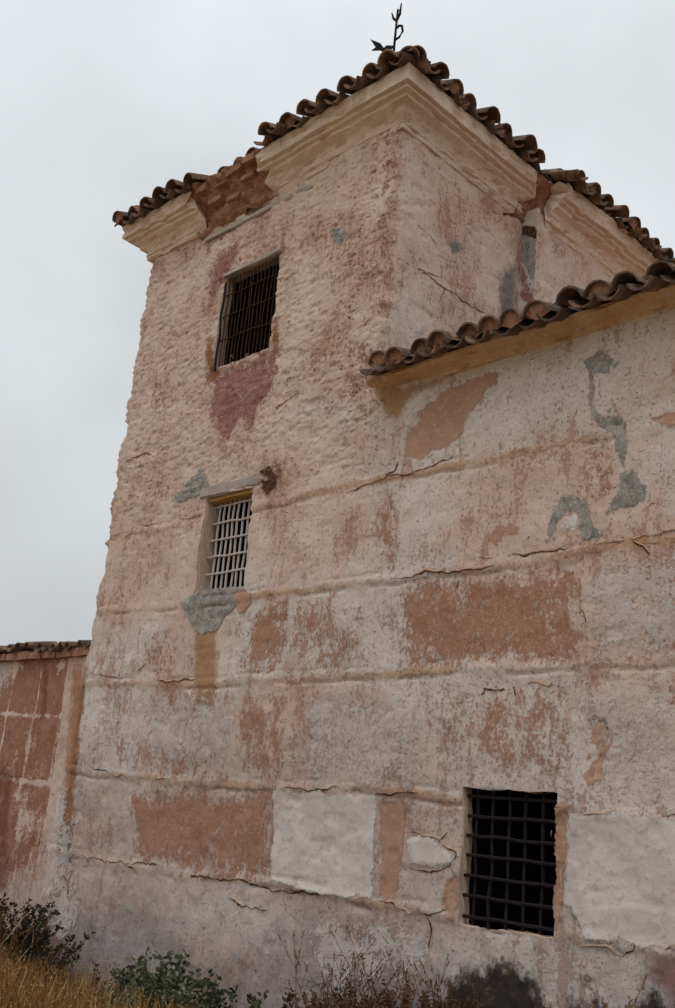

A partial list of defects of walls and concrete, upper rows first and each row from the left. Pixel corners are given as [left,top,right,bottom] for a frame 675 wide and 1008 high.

flaking render [195,151,258,209]
crack [399,258,486,314]
peeling [204,344,282,450]
peeling [399,372,498,459]
crack [348,455,454,492]
crack [394,545,574,588]
crack [601,529,675,556]
peeling [232,588,365,684]
peeling [396,563,588,790]
peeling [109,628,296,896]
crack [82,854,156,878]
crack [179,831,459,963]